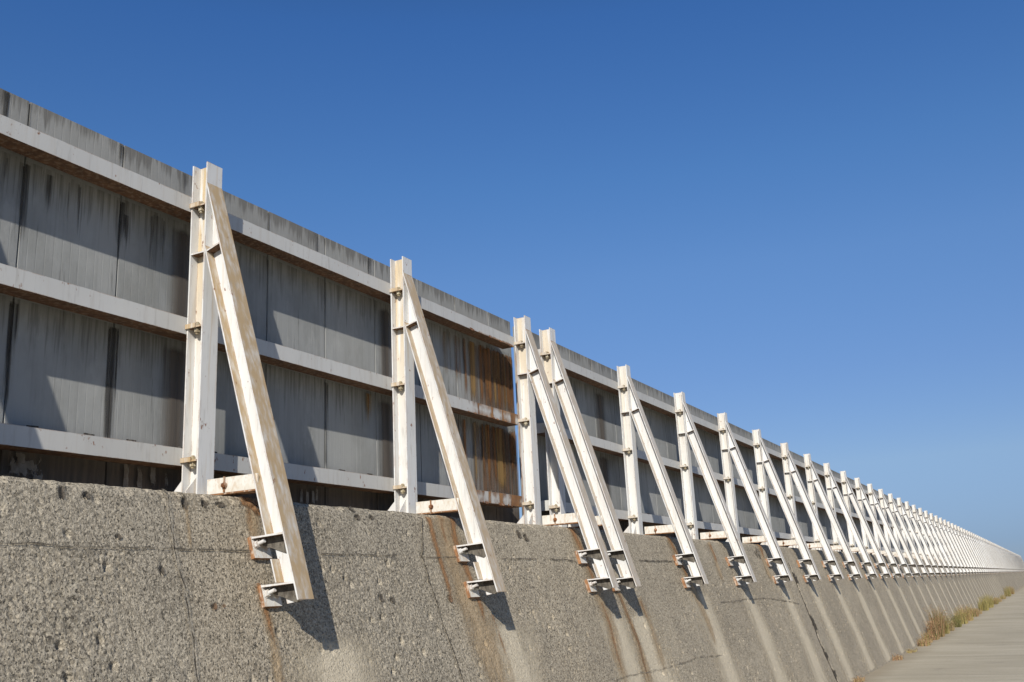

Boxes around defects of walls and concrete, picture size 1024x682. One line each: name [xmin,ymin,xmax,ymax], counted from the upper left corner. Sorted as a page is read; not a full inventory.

water stain [21,164,30,226]
water stain [118,202,128,249]
water stain [5,302,19,403]
water stain [104,327,119,438]
rust [456,327,524,514]
rust [256,583,283,682]
rust [426,515,505,682]
rust [568,527,625,676]